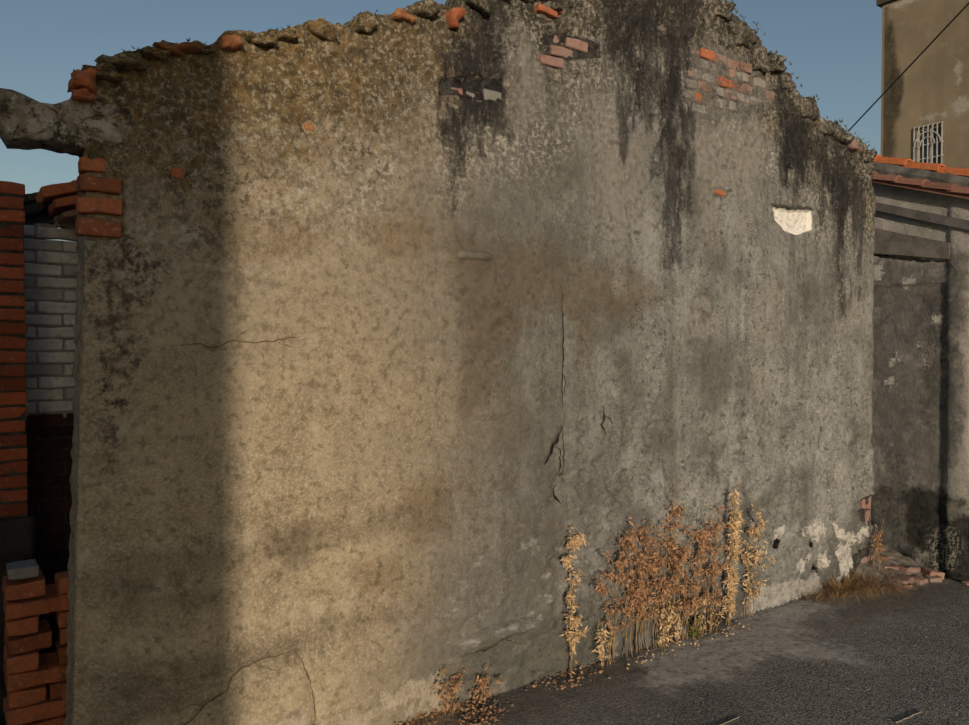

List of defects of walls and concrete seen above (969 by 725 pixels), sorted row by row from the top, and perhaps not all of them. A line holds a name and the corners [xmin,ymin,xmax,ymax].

spalling [533,0,566,21]
spalling [439,76,506,102]
spalling [539,33,600,69]
spalling [684,35,775,118]
spalling [771,203,812,235]
crack [177,330,301,349]
crack [559,284,567,404]
damp [870,253,969,582]
crack [544,427,565,504]
peeling [772,525,786,549]
peeling [796,495,969,588]
crack [181,650,316,725]